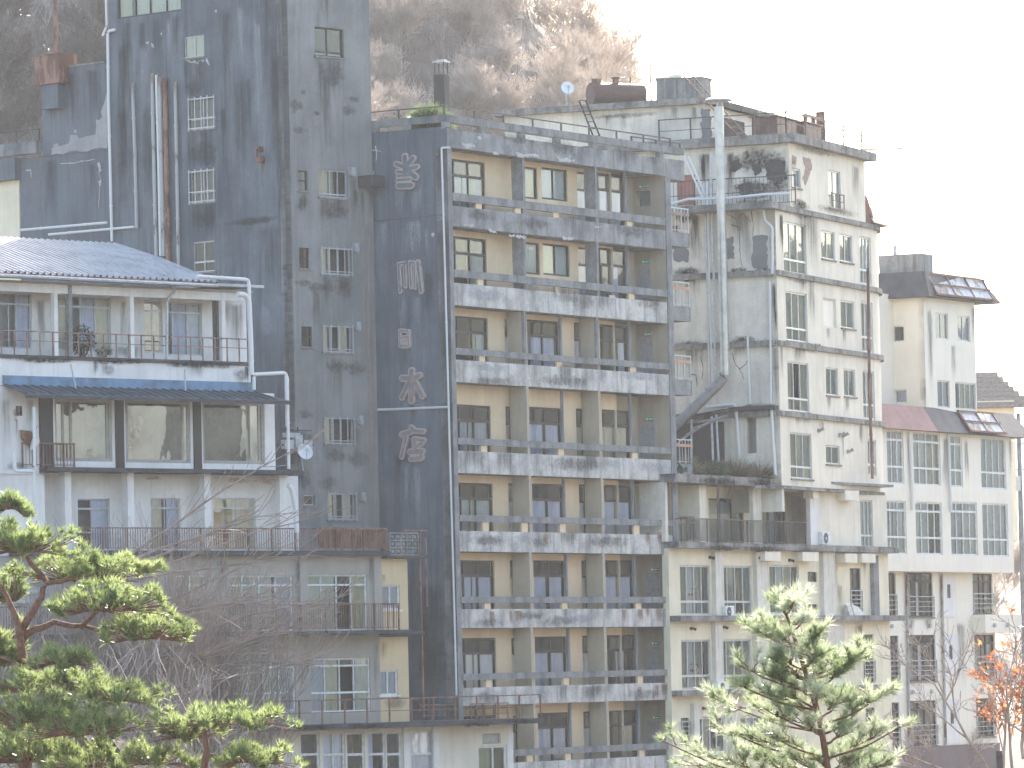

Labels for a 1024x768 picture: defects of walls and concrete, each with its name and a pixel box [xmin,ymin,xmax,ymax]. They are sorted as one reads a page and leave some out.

spalling [51,94,108,155]
peeling [701,155,709,180]
peeling [727,150,812,199]